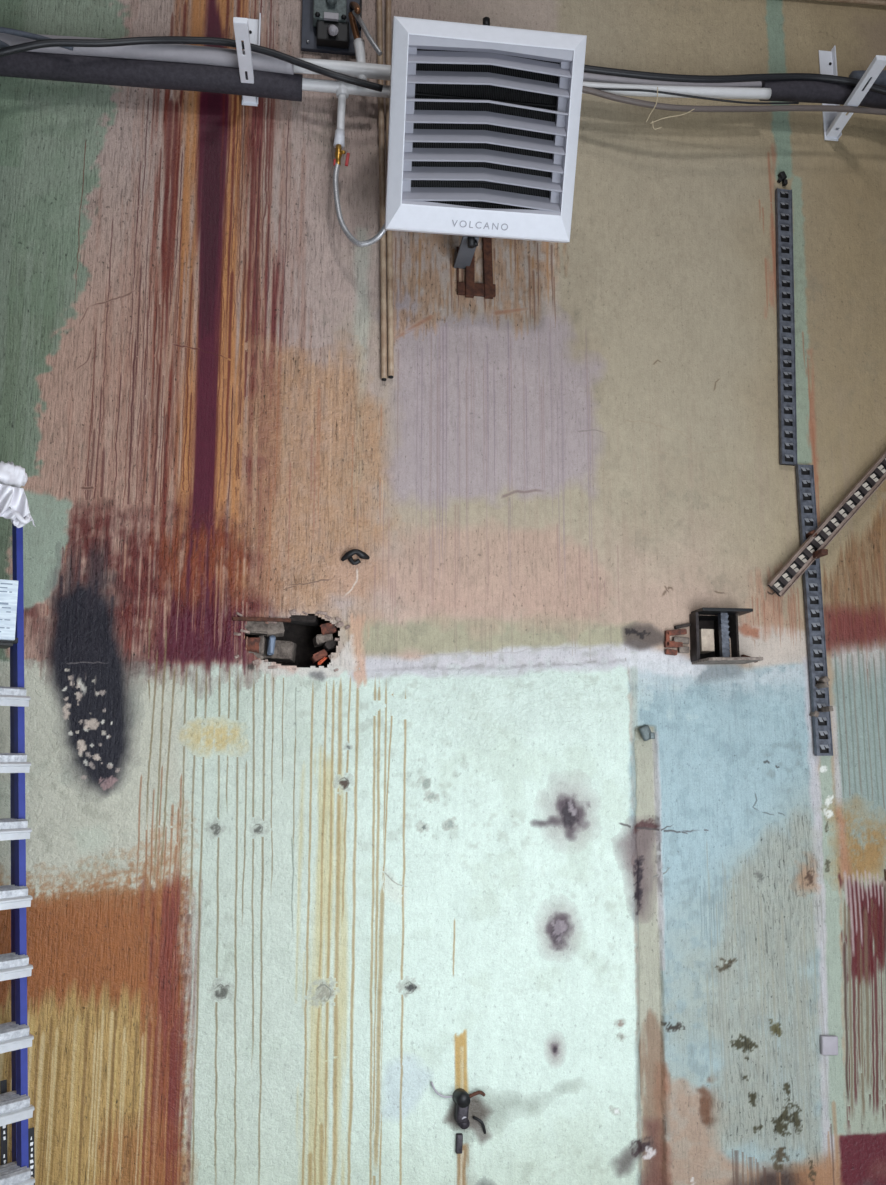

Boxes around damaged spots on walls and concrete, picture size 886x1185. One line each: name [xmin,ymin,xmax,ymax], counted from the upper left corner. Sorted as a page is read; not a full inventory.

rust [168,0,293,56]
rust [49,86,313,699]
rust [24,603,50,677]
spalling [233,609,360,683]
leakage [145,283,626,1185]
rust [0,909,11,954]
rust [0,980,11,1024]
rust [26,764,204,1185]
rust [637,793,886,1185]
leakage [699,804,832,1180]
rust [0,1051,12,1092]
rust [0,1123,12,1166]